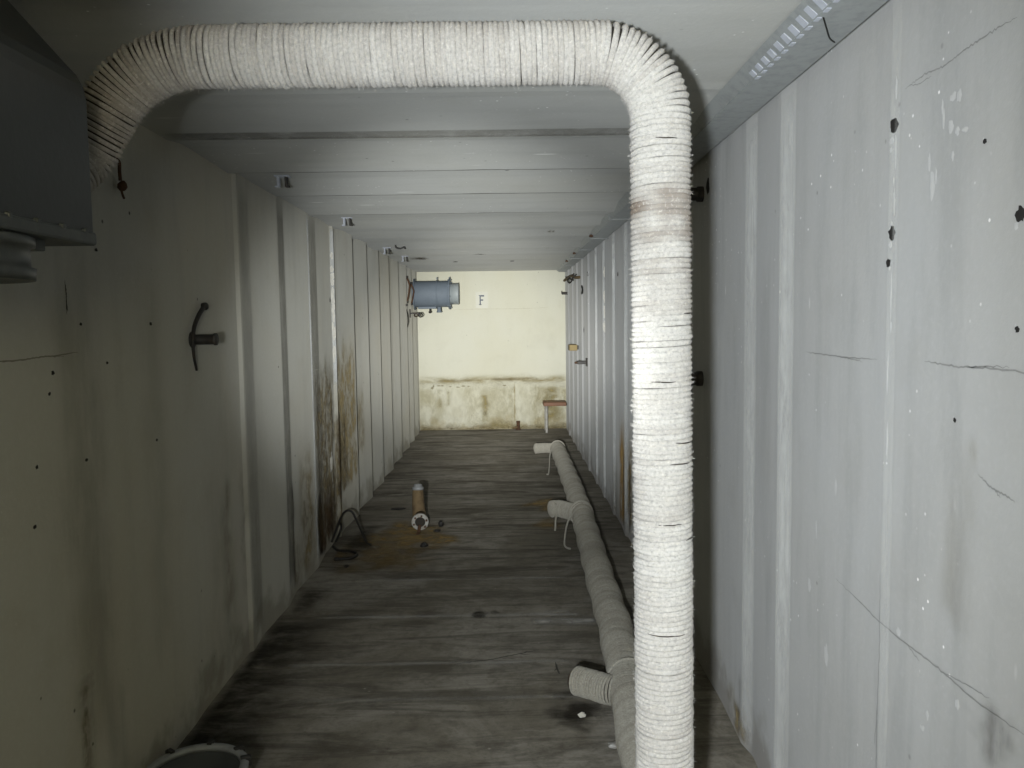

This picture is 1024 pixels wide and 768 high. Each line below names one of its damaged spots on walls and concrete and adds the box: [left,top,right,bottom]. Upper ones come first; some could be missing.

crack [908,17,1017,87]
crack [809,352,872,362]
crack [925,361,1024,374]
crack [978,474,1015,502]
crack [836,579,1024,768]